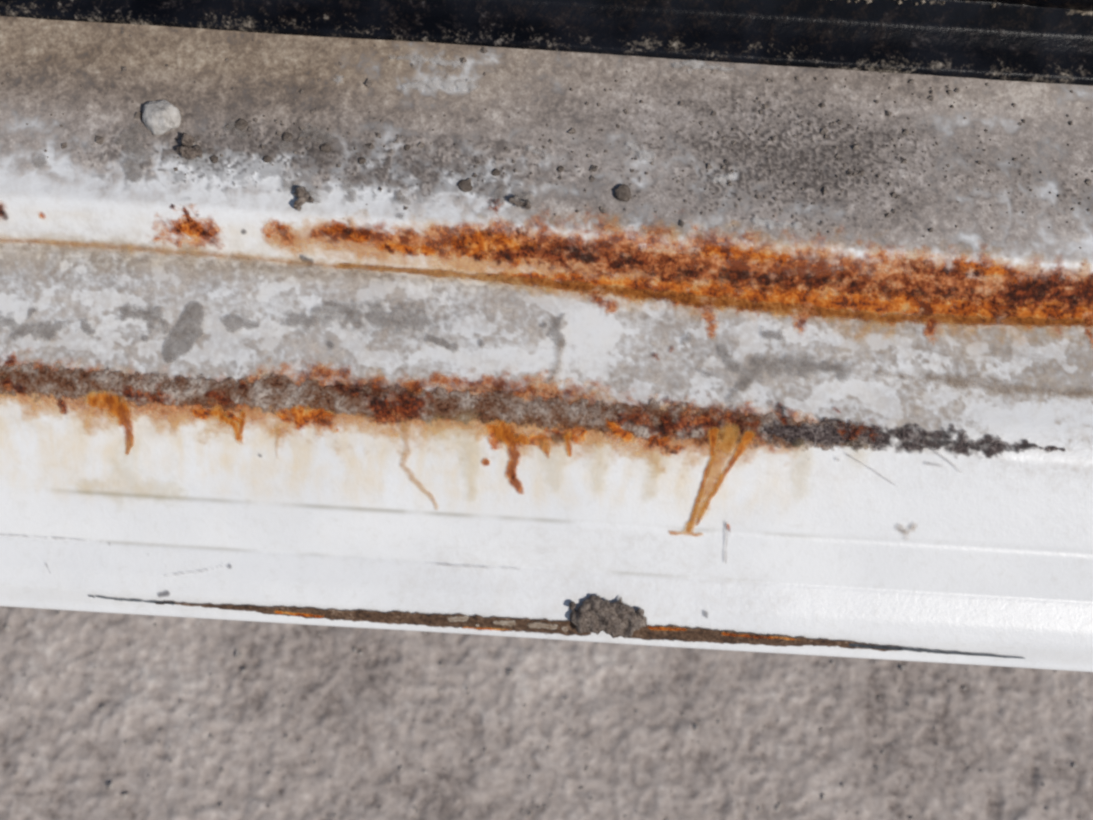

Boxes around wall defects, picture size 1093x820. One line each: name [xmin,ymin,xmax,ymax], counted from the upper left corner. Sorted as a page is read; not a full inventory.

rust [154,204,220,254]
rust [263,198,1093,344]
rust [2,356,99,397]
rust [39,392,67,414]
rust [87,378,246,455]
rust [277,406,338,431]
rust [280,363,598,424]
rust [775,403,814,424]
rust [475,421,587,494]
rust [605,399,761,536]